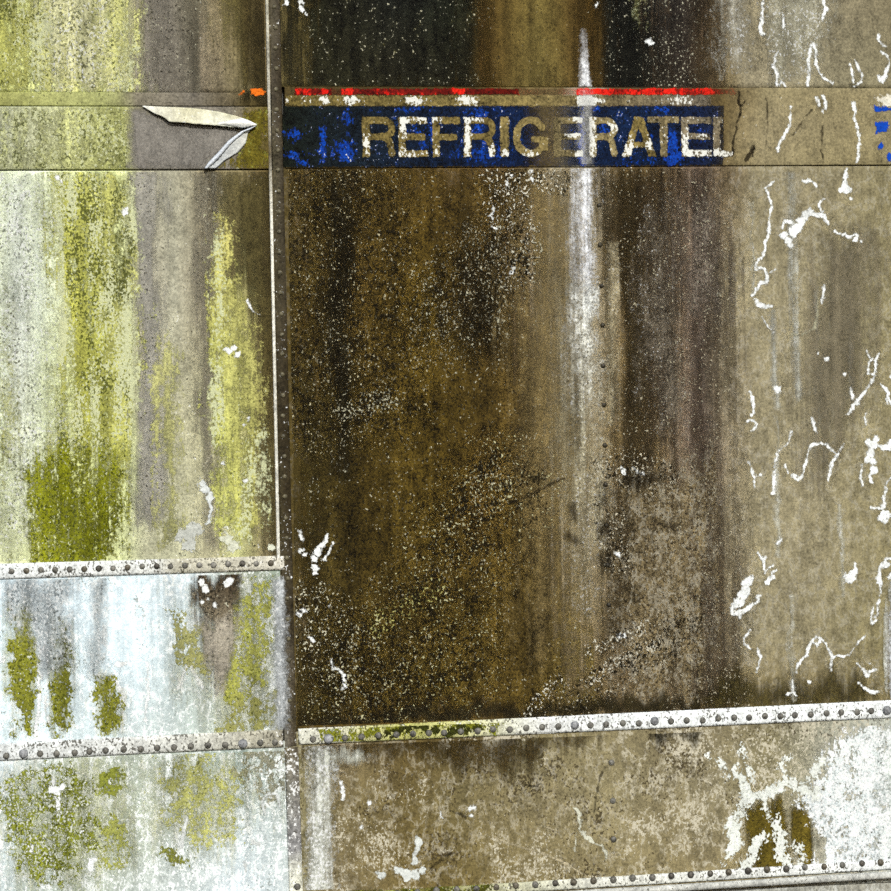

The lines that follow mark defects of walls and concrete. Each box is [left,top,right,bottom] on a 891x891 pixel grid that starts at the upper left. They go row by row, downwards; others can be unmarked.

leakage [0,0,206,92]
peeling [128,106,268,169]
peeling [751,181,862,309]
leakage [0,172,189,563]
leakage [193,172,276,555]
leakage [299,168,878,726]
peeling [747,431,842,495]
peeling [859,436,891,486]
leakage [2,579,76,739]
leakage [89,579,126,737]
peeling [730,575,762,619]
peeling [704,726,891,869]